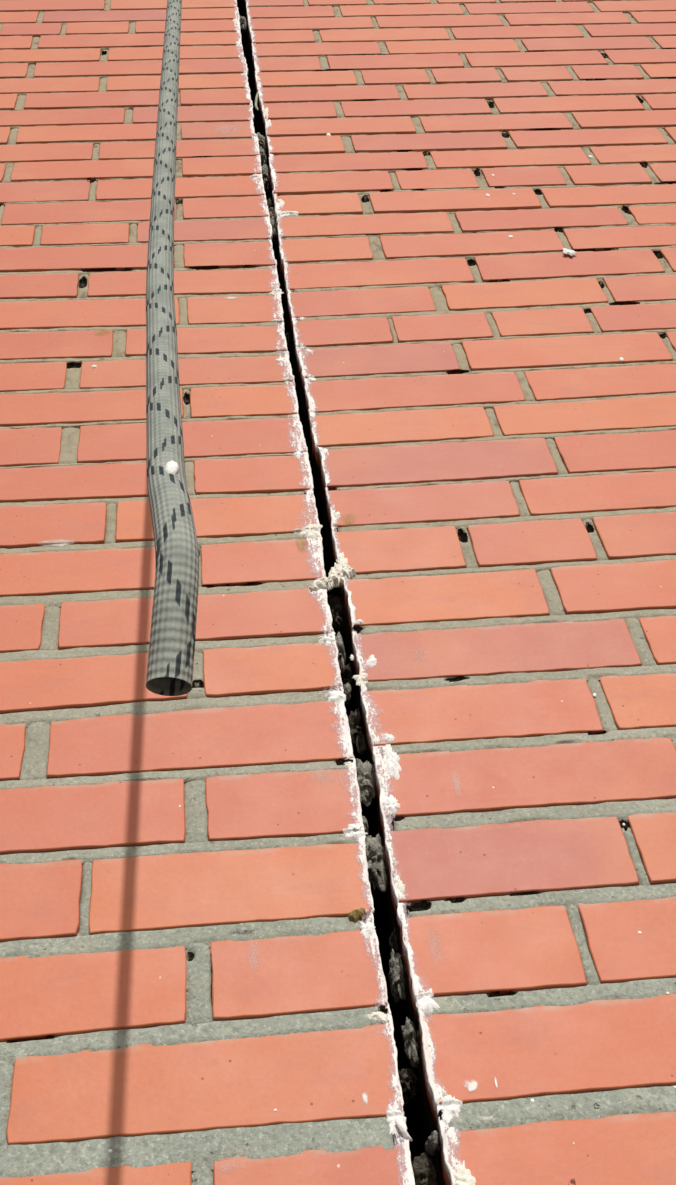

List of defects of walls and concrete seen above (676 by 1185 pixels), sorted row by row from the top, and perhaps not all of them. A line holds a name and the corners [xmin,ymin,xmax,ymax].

crack [237,0,442,1185]